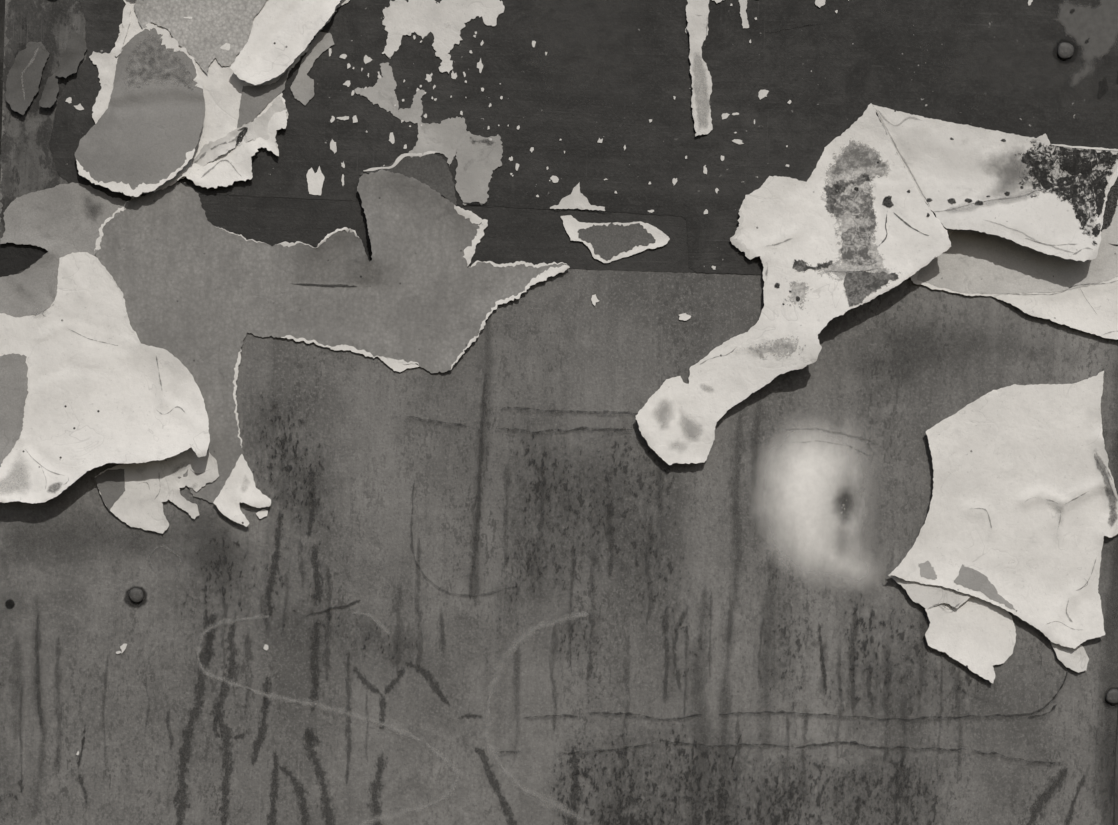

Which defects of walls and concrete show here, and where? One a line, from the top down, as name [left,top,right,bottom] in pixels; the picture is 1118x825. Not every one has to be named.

peeling [1056,0,1118,99]